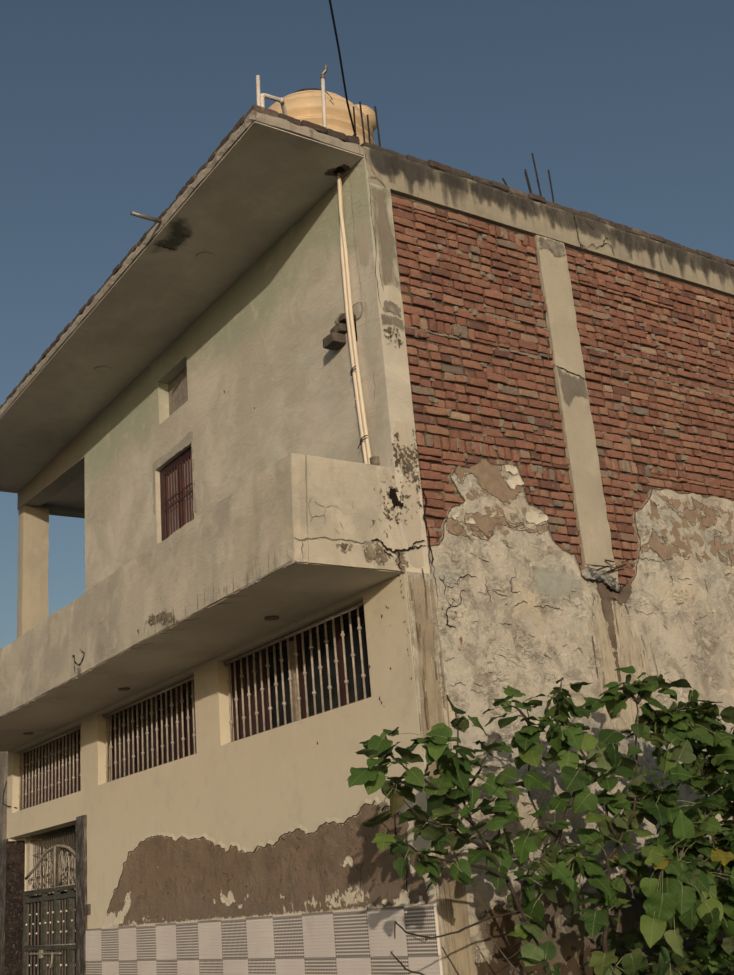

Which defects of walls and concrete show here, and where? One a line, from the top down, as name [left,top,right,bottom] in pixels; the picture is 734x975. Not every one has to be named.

water stain [370,146,734,285]
spalling [389,488,404,508]
crack [294,489,595,627]
peeling [431,458,581,571]
peeling [608,487,734,601]
peeling [102,796,429,928]